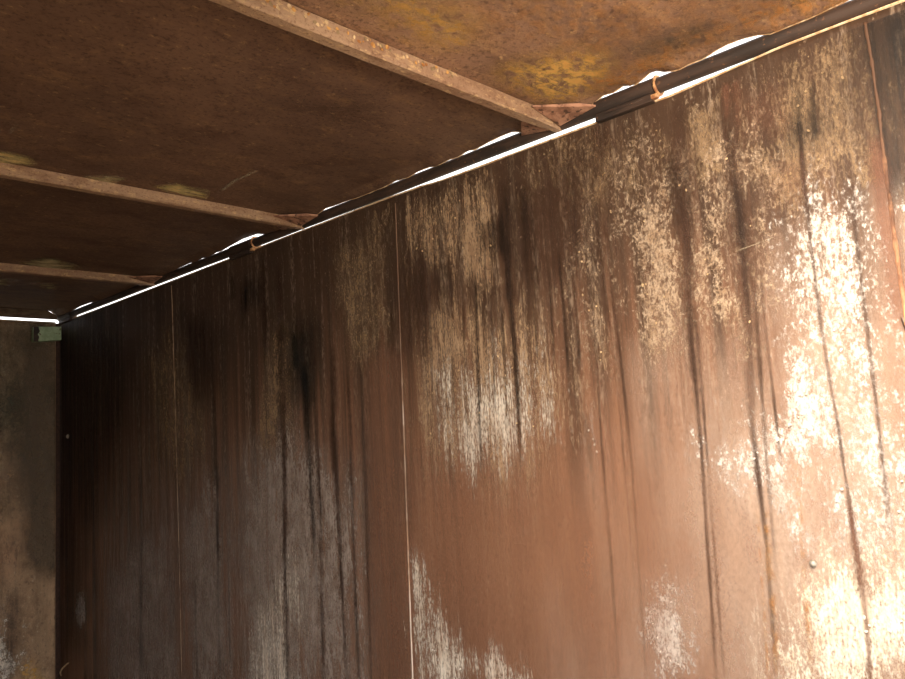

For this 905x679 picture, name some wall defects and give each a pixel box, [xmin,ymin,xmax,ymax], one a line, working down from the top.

corrosion [508,53,668,100]
damp [864,13,905,189]
damp [331,371,346,658]
damp [484,198,521,440]
damp [675,132,905,679]